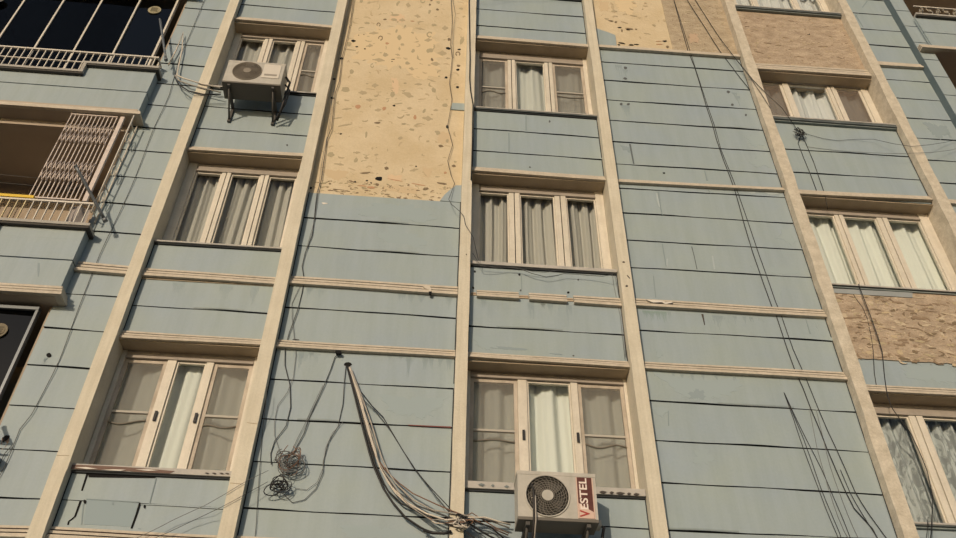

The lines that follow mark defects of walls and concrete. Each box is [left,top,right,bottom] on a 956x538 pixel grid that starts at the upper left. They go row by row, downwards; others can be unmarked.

spalling [592,0,865,70]
spalling [309,0,468,204]
spalling [833,288,956,367]